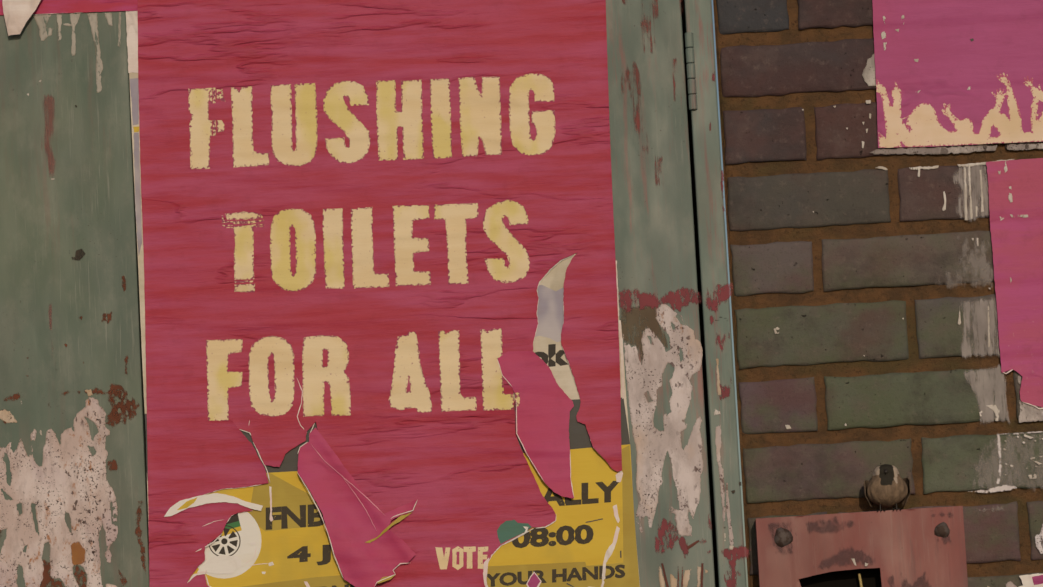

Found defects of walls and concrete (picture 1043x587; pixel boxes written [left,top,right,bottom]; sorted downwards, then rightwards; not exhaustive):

peeling [0,389,118,587]
rust [64,356,139,426]
rust [135,501,146,569]
peeling [619,283,749,587]